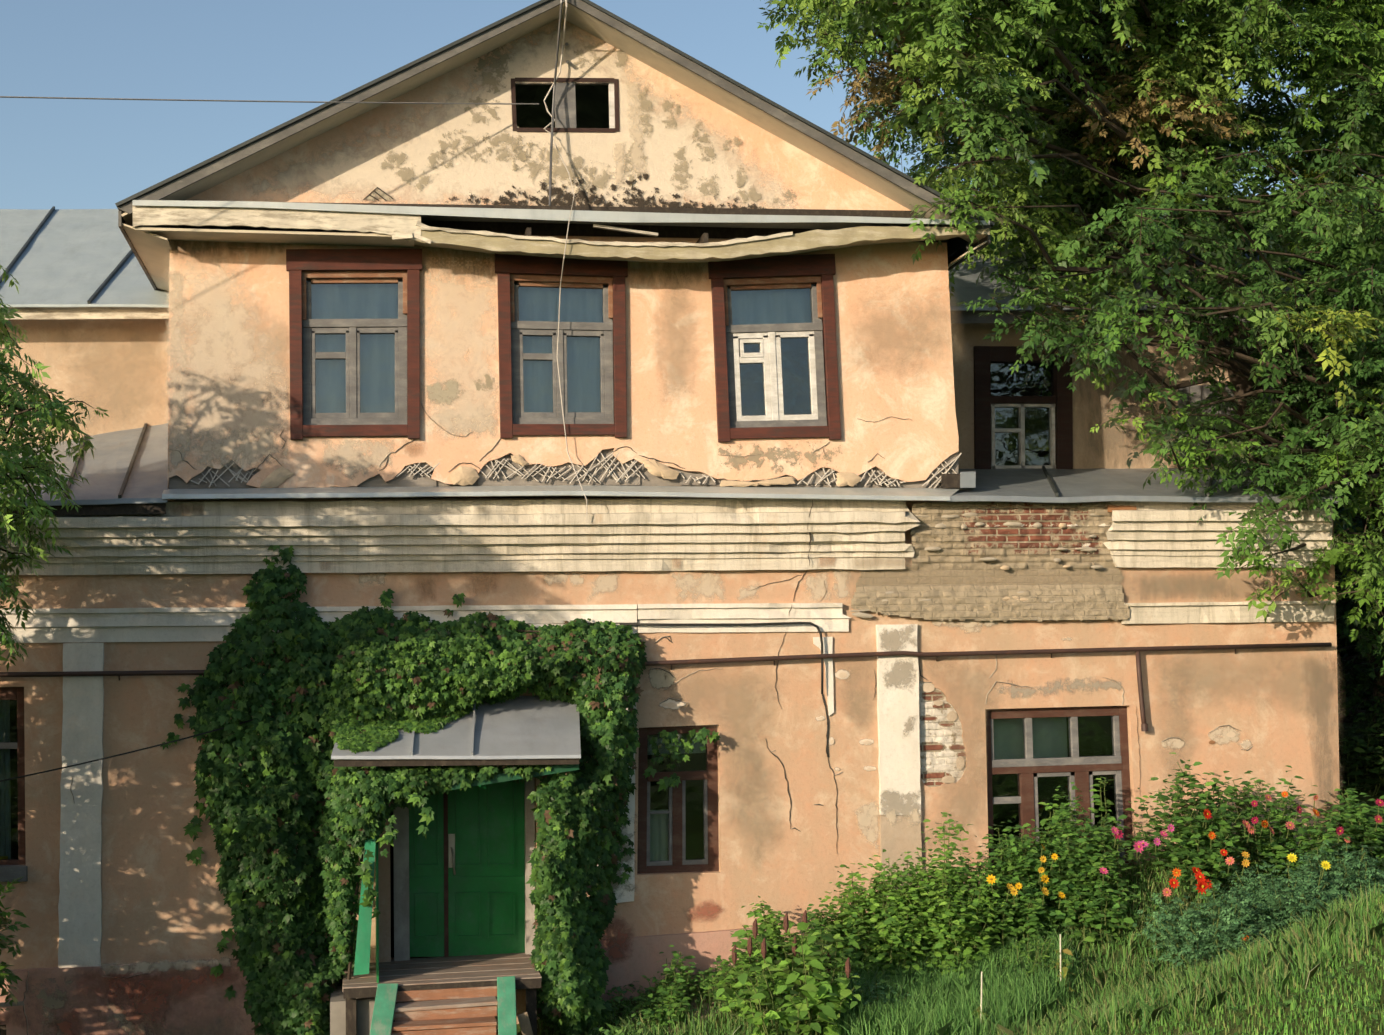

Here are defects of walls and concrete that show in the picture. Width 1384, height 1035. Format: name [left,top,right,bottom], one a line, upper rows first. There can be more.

peeling [253,27,796,209]
peeling [323,440,440,487]
flaking render [478,451,649,486]
flaking render [680,471,716,485]
flaking render [719,444,976,489]
crack [750,500,826,709]
spalling [855,626,966,848]
peeling [1161,737,1185,748]
peeling [1208,725,1253,751]
crack [766,698,869,850]
damp [101,958,231,975]